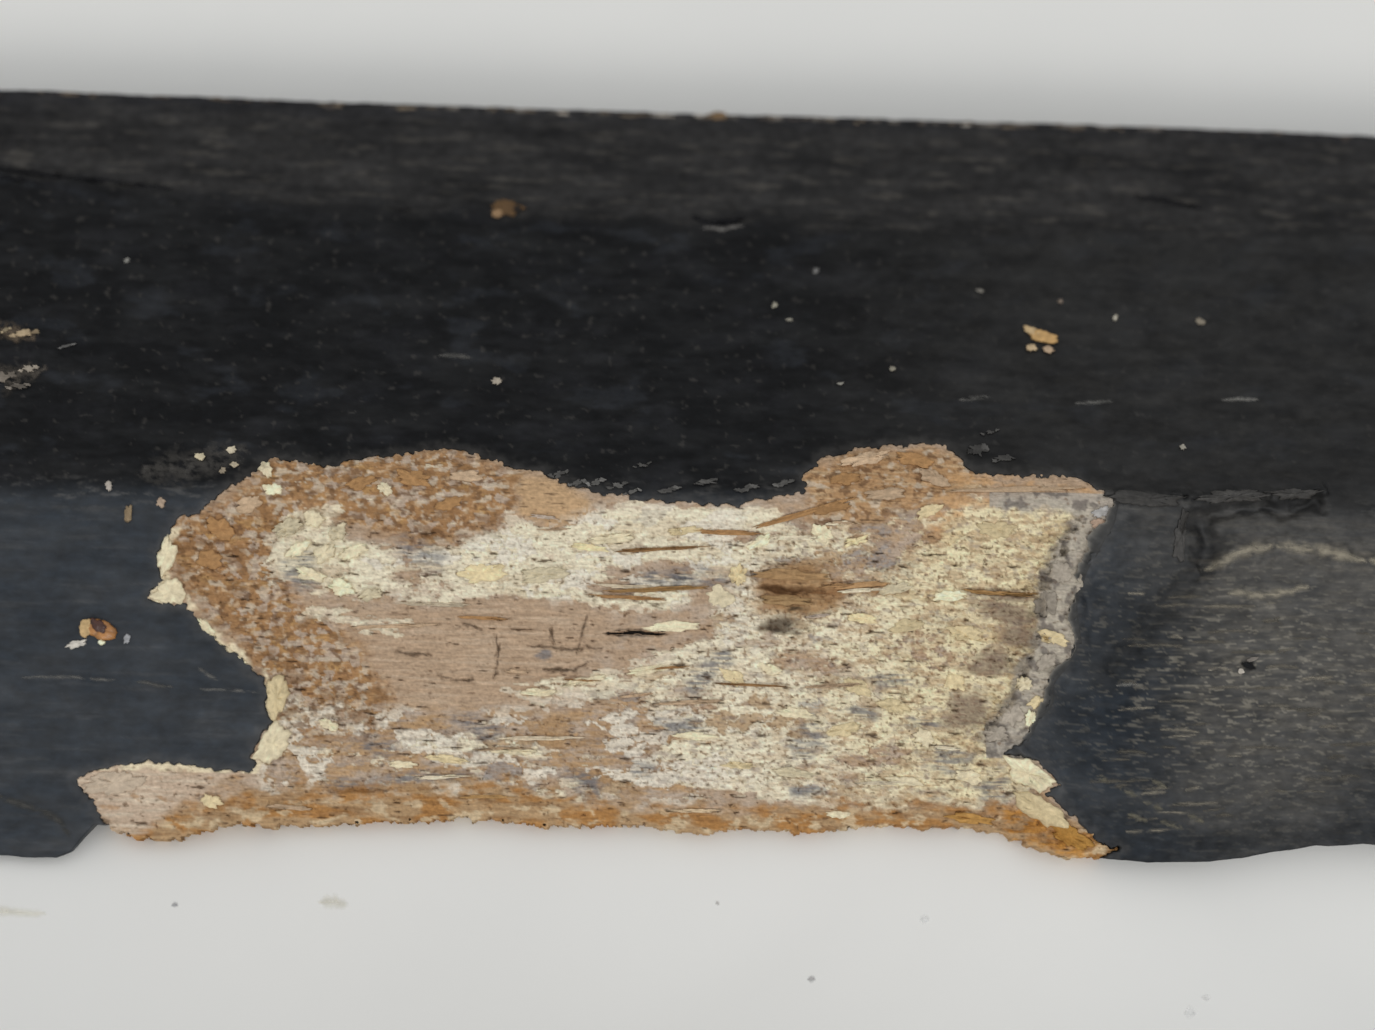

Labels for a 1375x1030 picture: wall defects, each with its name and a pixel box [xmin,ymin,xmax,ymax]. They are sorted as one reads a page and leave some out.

peeling [0,326,39,342]
peeling [1023,325,1058,354]
peeling [0,365,45,390]
peeling [1206,543,1375,570]
peeling [65,618,131,649]
spalling [77,429,1325,860]